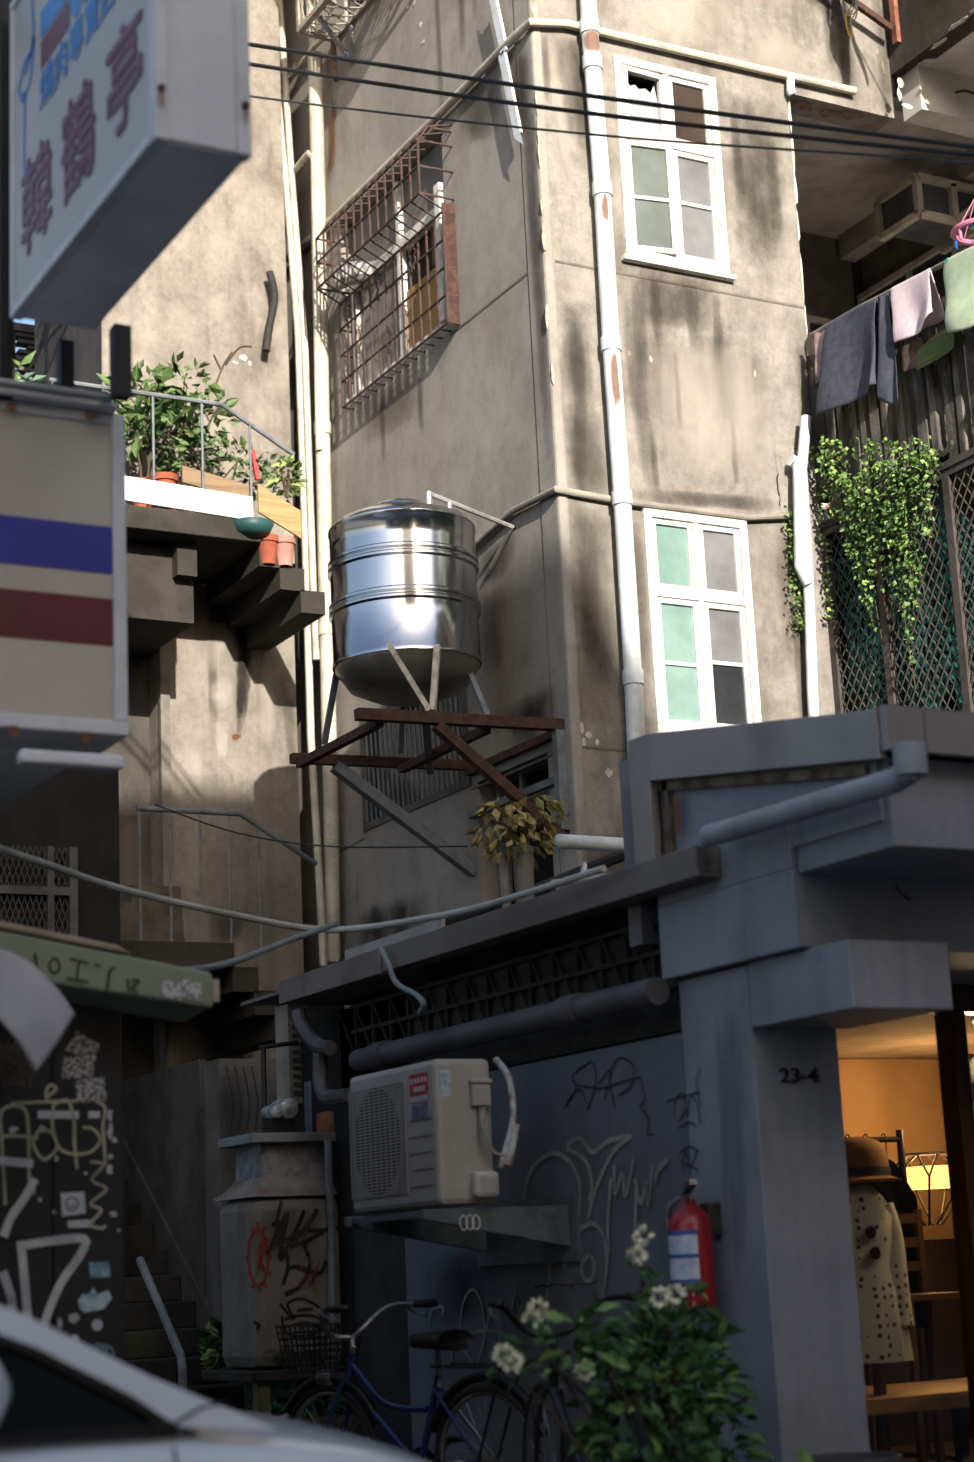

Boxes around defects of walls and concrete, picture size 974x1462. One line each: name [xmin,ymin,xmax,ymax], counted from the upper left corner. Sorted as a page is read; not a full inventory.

rust [611,353,620,404]
water stain [684,495,744,506]